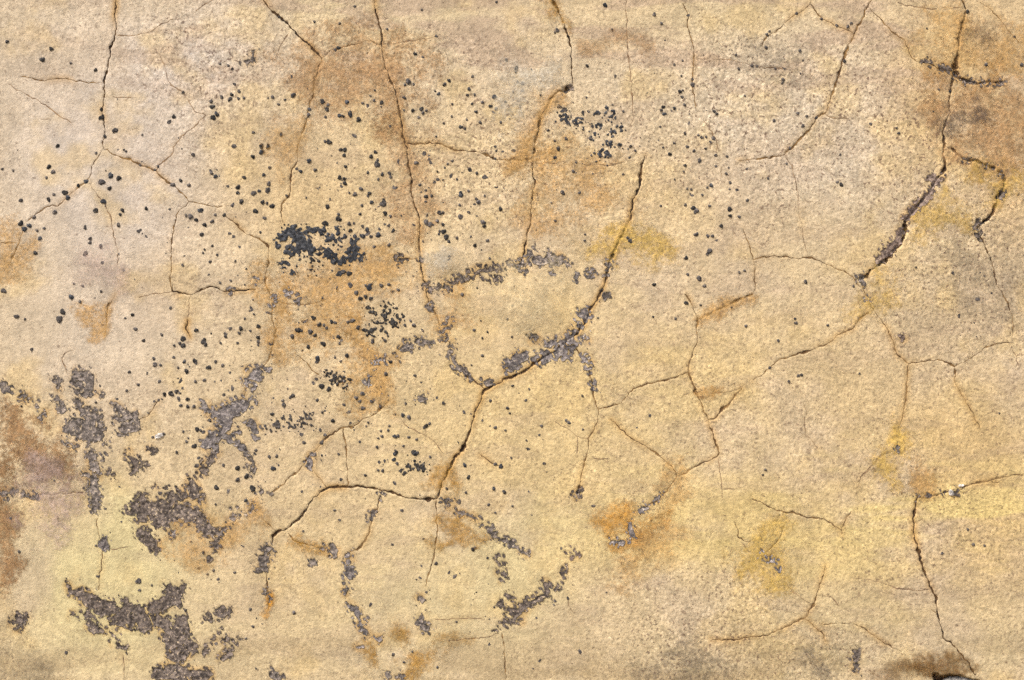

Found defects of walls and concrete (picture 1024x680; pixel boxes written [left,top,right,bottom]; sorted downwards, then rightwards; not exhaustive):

crack [0,2,328,395]
crack [258,0,1019,584]
crack [435,618,506,675]
crack [712,568,902,652]
crack [865,474,1023,675]